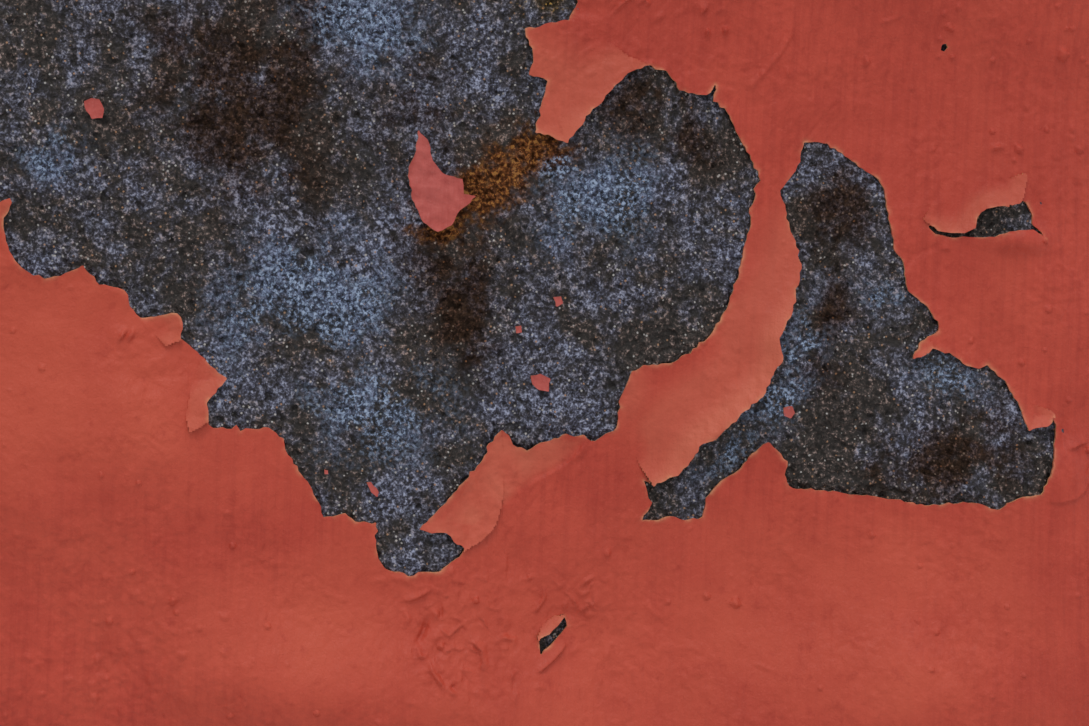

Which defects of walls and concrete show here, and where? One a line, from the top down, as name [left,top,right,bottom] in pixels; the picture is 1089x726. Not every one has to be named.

rust [459,134,564,213]
peeling [0,0,1064,576]
peeling [539,614,566,654]